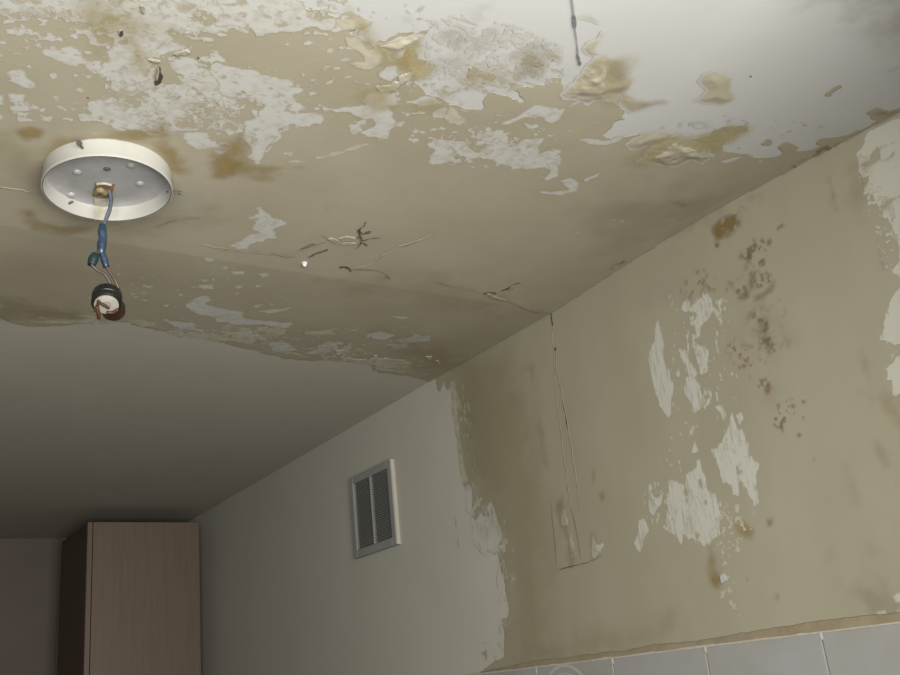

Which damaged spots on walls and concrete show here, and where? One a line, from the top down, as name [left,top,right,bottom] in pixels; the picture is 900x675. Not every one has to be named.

crack [202,221,441,279]
peeling [0,0,900,382]
crack [436,282,601,570]
peeling [436,113,900,672]